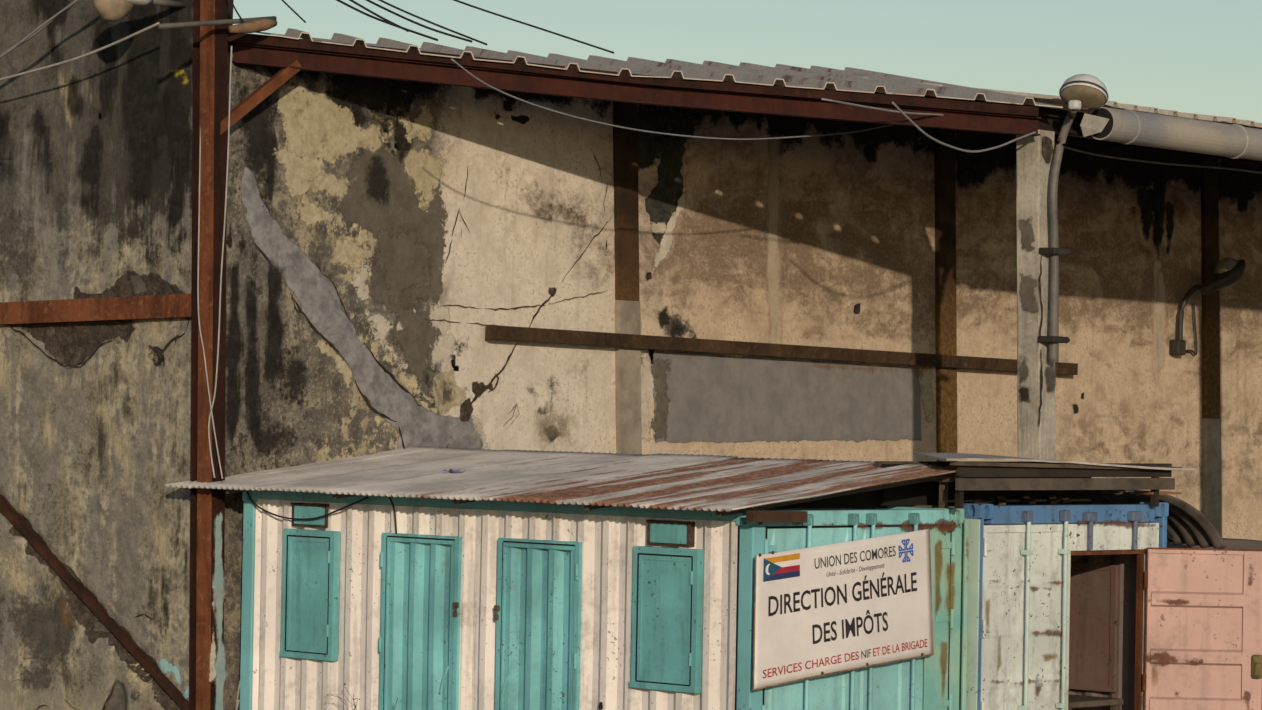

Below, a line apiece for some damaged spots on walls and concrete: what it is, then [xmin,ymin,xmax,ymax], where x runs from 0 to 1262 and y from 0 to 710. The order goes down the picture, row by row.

spalling [11,320,135,366]
water stain [32,0,193,247]
spalling [74,271,186,299]
spalling [148,345,164,366]
flaking render [274,82,467,415]
crack [424,148,611,448]
flaking render [638,110,695,280]
water stain [955,130,1016,188]
water stain [1054,136,1201,384]
water stain [1218,159,1262,212]
rust [858,519,960,691]
rust [1145,653,1203,677]